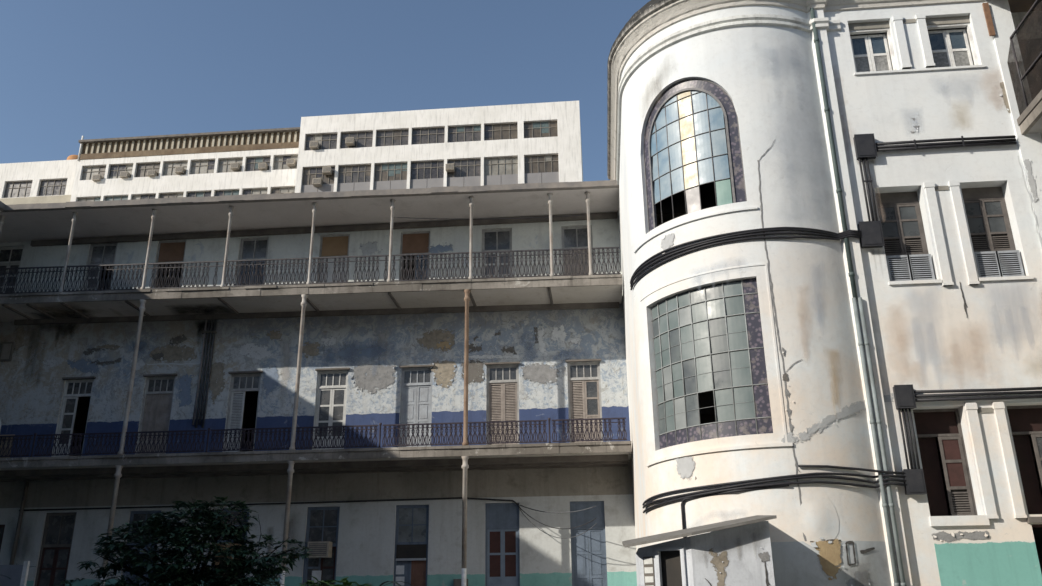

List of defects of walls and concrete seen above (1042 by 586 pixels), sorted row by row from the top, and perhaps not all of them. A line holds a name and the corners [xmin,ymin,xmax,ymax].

crack [757,140,803,506]
peeling [350,360,399,394]
peeling [417,324,583,388]
flaking render [709,548,729,586]
flaking render [811,537,846,580]